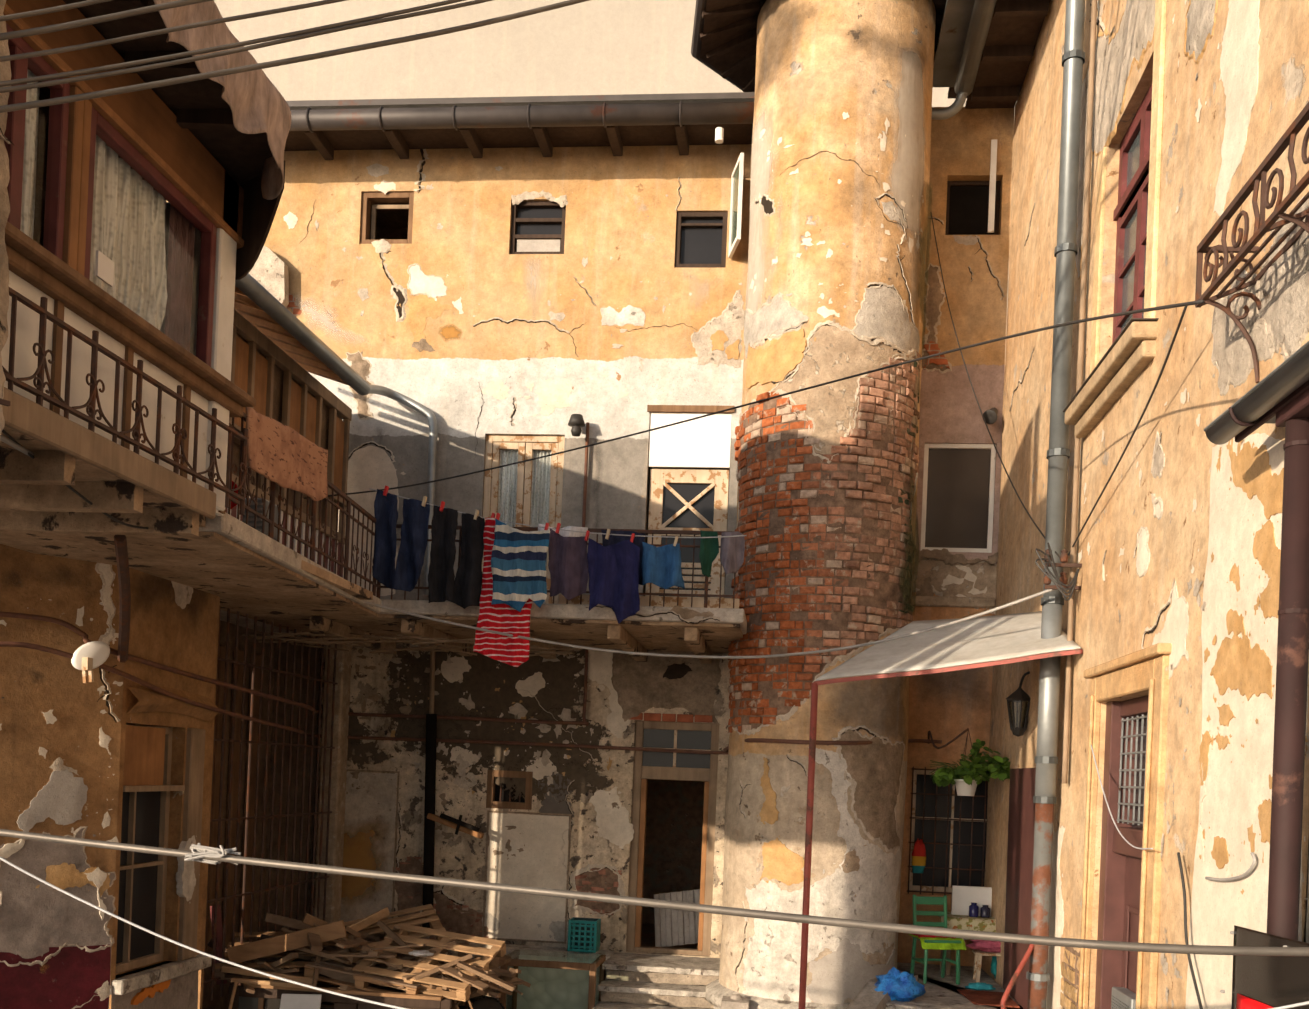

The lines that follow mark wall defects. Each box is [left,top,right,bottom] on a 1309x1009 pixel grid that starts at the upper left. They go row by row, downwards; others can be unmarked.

spalling [1075,0,1155,280]
peeling [1172,0,1260,216]
crack [379,251,398,292]
crack [473,276,695,355]
crack [751,151,944,384]
crack [968,235,1005,300]
flaking render [691,256,998,767]
peeling [346,643,634,849]
peeling [1152,433,1285,1009]
spalling [0,798,119,967]
flaking render [393,856,519,943]
flaking render [537,855,625,944]